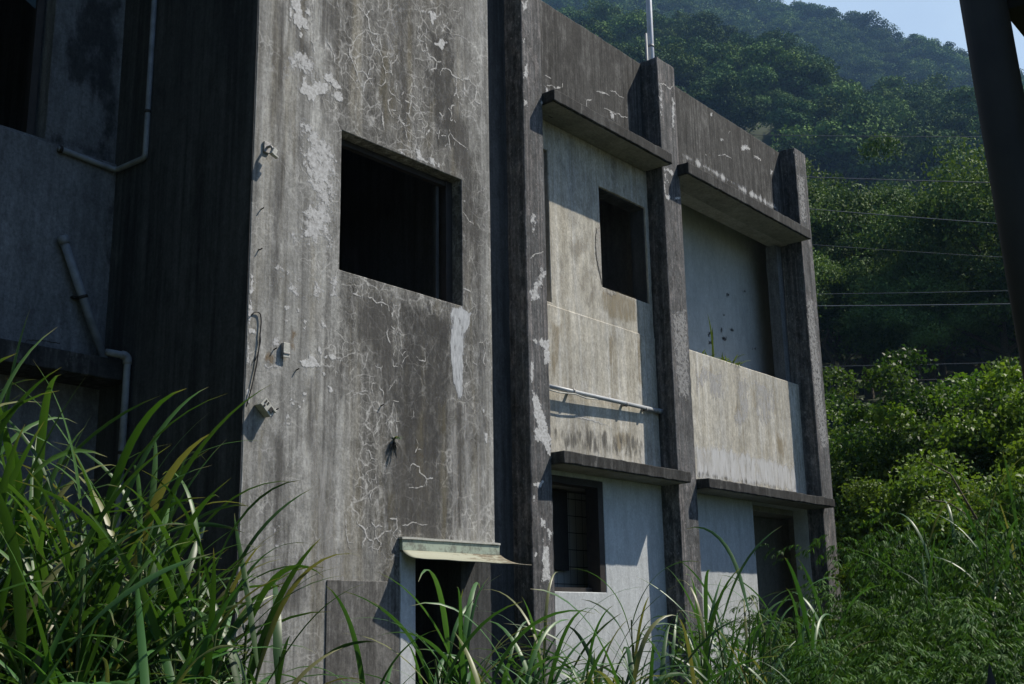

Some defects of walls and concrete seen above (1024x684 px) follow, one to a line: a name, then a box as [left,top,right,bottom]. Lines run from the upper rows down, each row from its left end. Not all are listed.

peeling [289,0,311,38]
peeling [286,52,343,102]
crack [308,0,480,150]
peeling [291,121,337,257]
crack [345,290,433,553]
peeling [450,307,471,399]
peeling [530,337,552,456]
leakage [556,429,638,455]